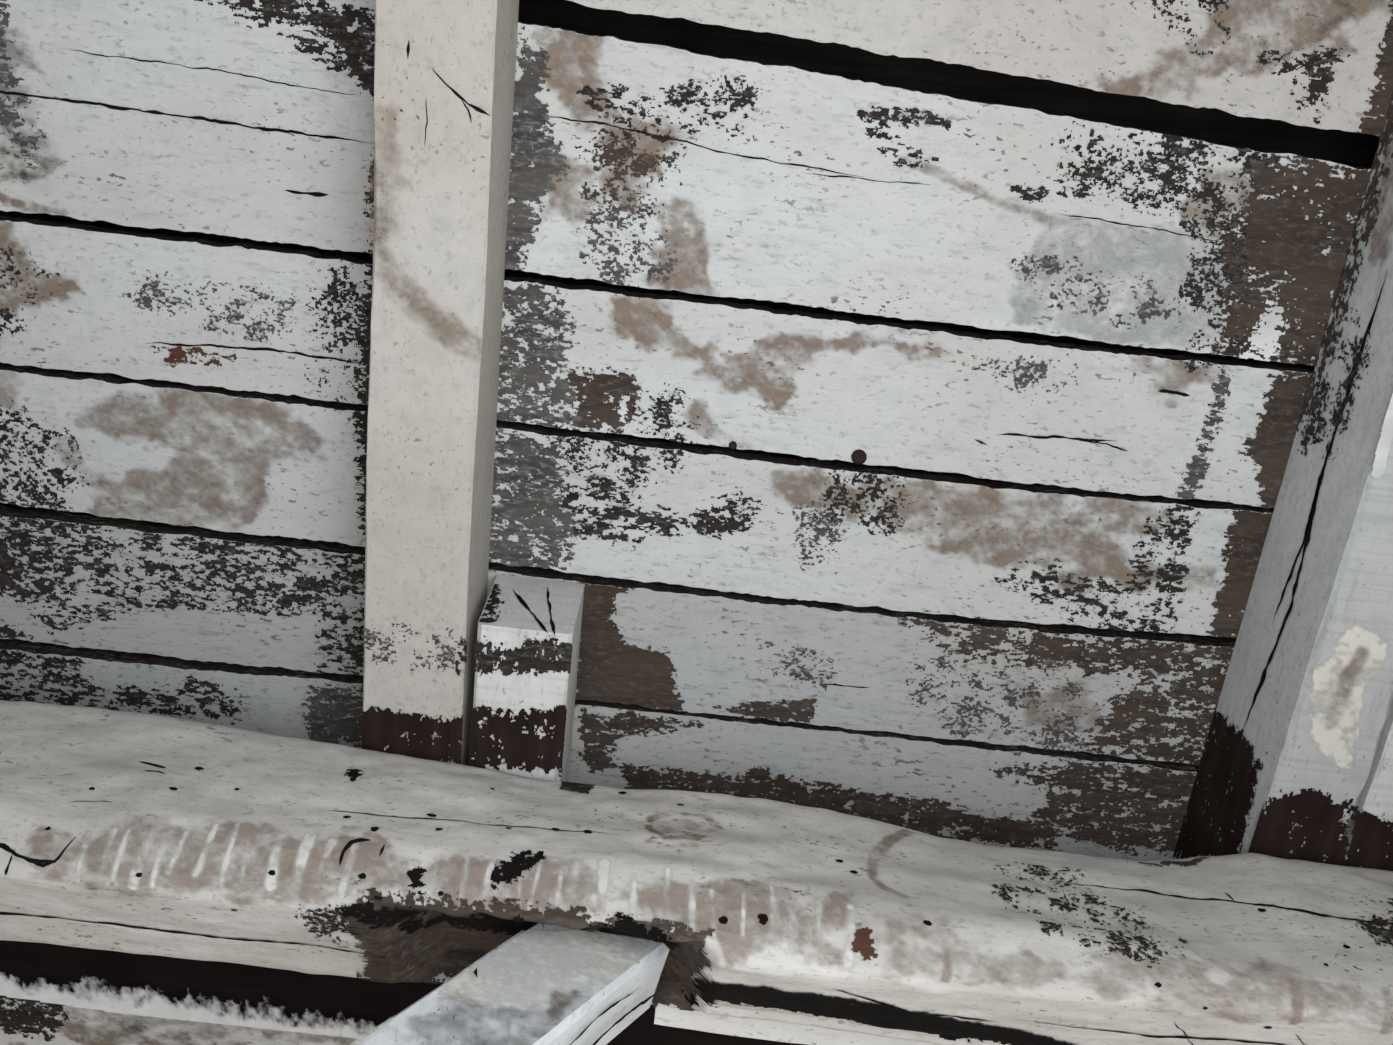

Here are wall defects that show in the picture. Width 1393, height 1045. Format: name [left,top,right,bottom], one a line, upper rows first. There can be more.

peeling [195,0,375,101]
peeling [304,260,373,548]
water stain [612,298,876,410]
peeling [411,0,1393,871]
water stain [884,480,1170,594]
crack [1243,270,1388,729]
peeling [0,516,419,675]
peeling [301,683,567,777]
crack [0,837,76,875]
water stain [31,821,404,904]
water stain [432,856,610,918]
water stain [629,867,855,969]